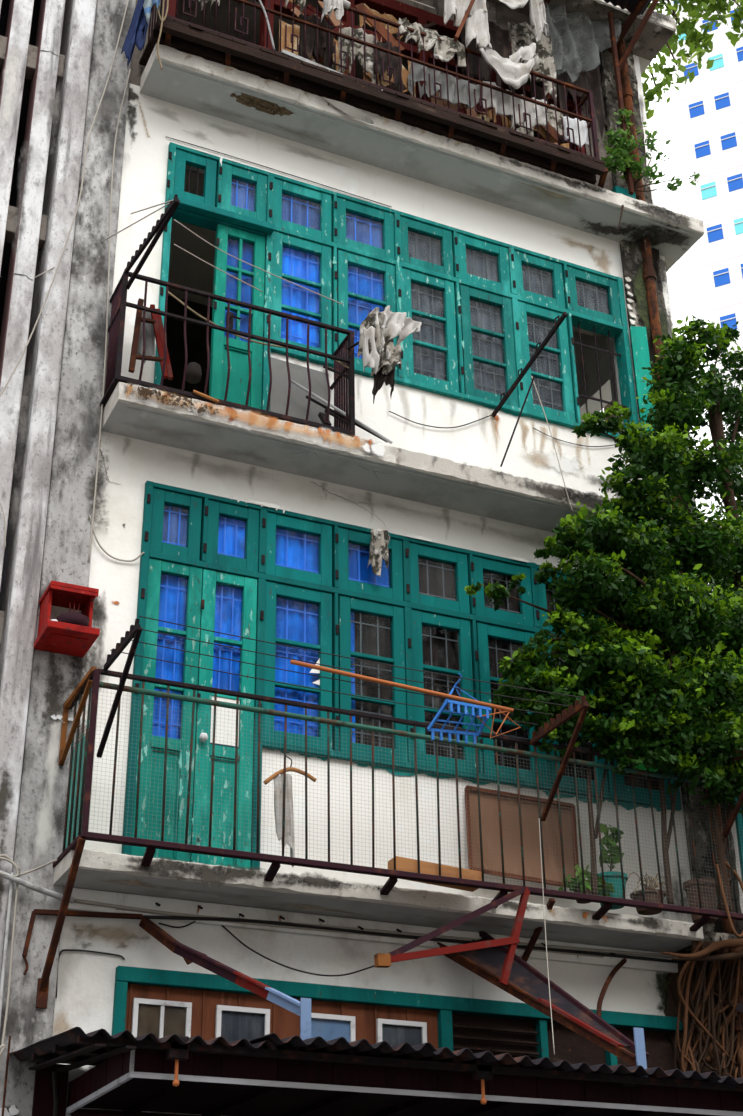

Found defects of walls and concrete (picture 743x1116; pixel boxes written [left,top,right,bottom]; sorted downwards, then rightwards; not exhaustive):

leakage [115,1,132,60]
leakage [101,87,148,166]
spalling [230,91,297,118]
leakage [501,158,606,198]
leakage [568,240,608,268]
leakage [581,201,690,303]
corrosion [130,386,372,455]
leakage [520,419,561,463]
leakage [81,414,108,526]
leakage [519,478,622,509]
leakage [111,857,262,887]
leakage [280,873,347,888]